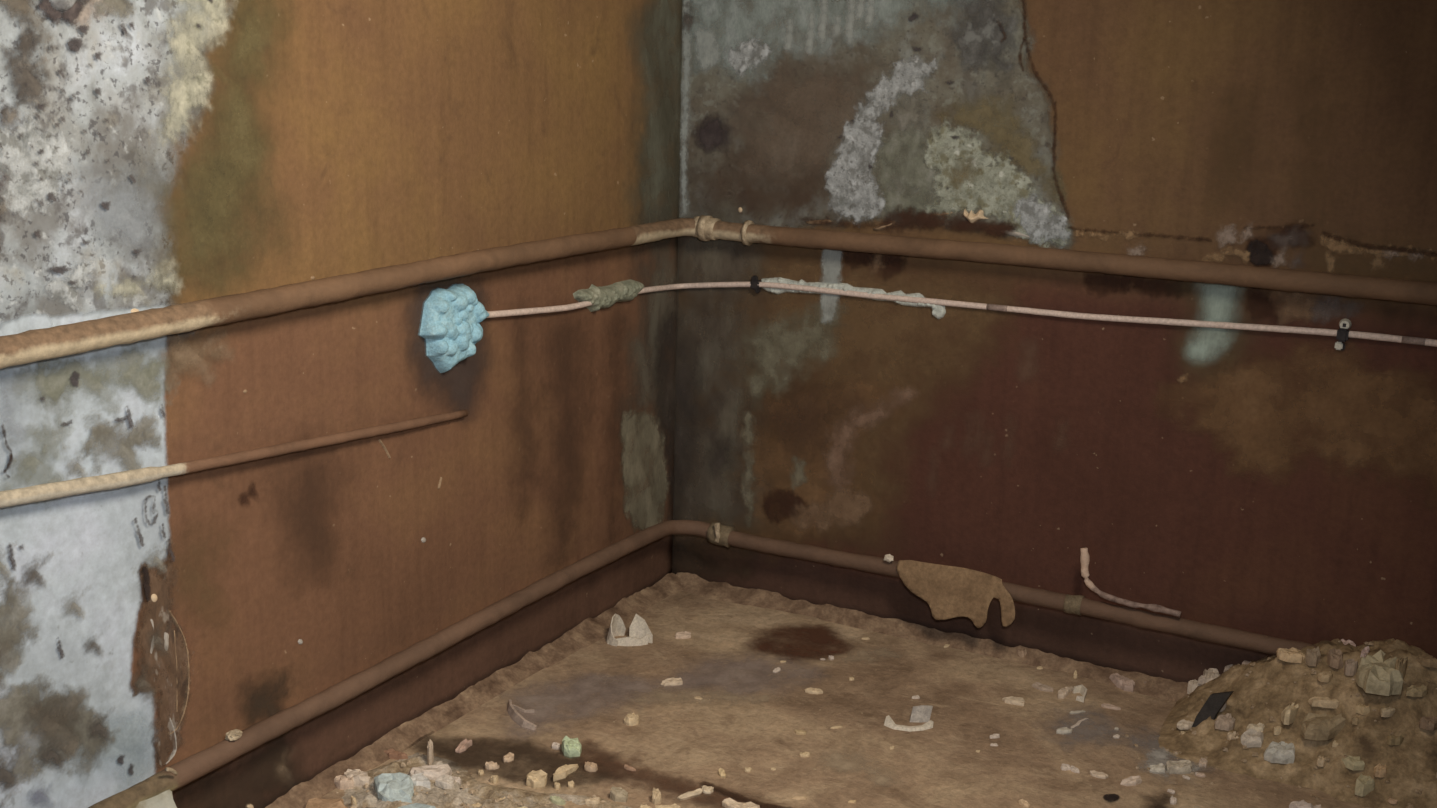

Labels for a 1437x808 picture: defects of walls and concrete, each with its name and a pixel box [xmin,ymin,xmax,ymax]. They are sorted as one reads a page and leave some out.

flaking render [0,0,212,336]
peeling [679,0,1072,248]
crack [999,0,1210,255]
crack [1246,224,1437,256]
water stain [631,236,1007,576]
water stain [0,544,134,804]
flaking render [0,332,190,808]
peeling [884,554,1015,628]